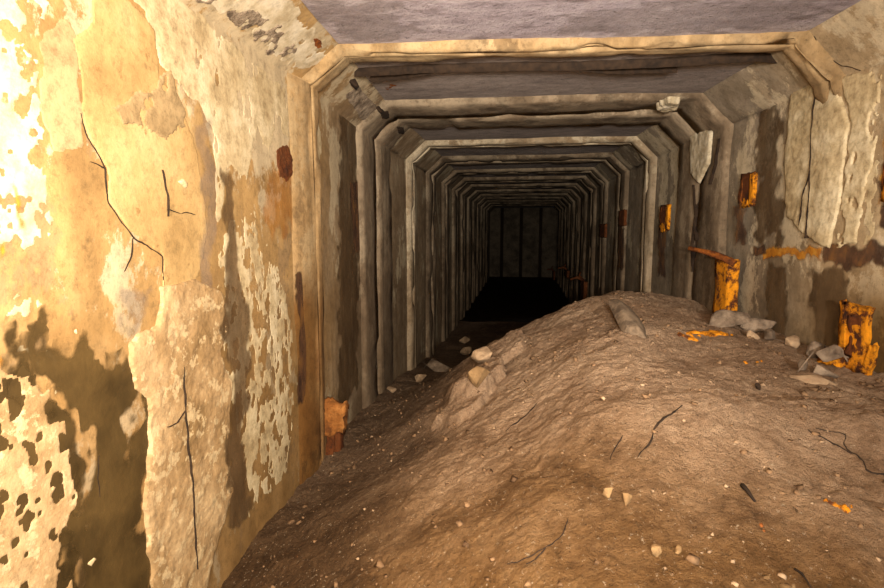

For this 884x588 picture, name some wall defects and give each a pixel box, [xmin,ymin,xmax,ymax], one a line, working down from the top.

spalling [346,79,390,129]
flaking render [655,96,681,113]
crack [80,113,165,286]
crack [162,170,195,217]
flaking render [689,130,713,183]
flaking render [784,71,882,248]
rust [734,202,884,272]
flaking render [0,0,329,588]
rust [862,342,880,376]
damp [0,308,151,588]
crack [168,367,198,569]
rust [324,396,349,455]